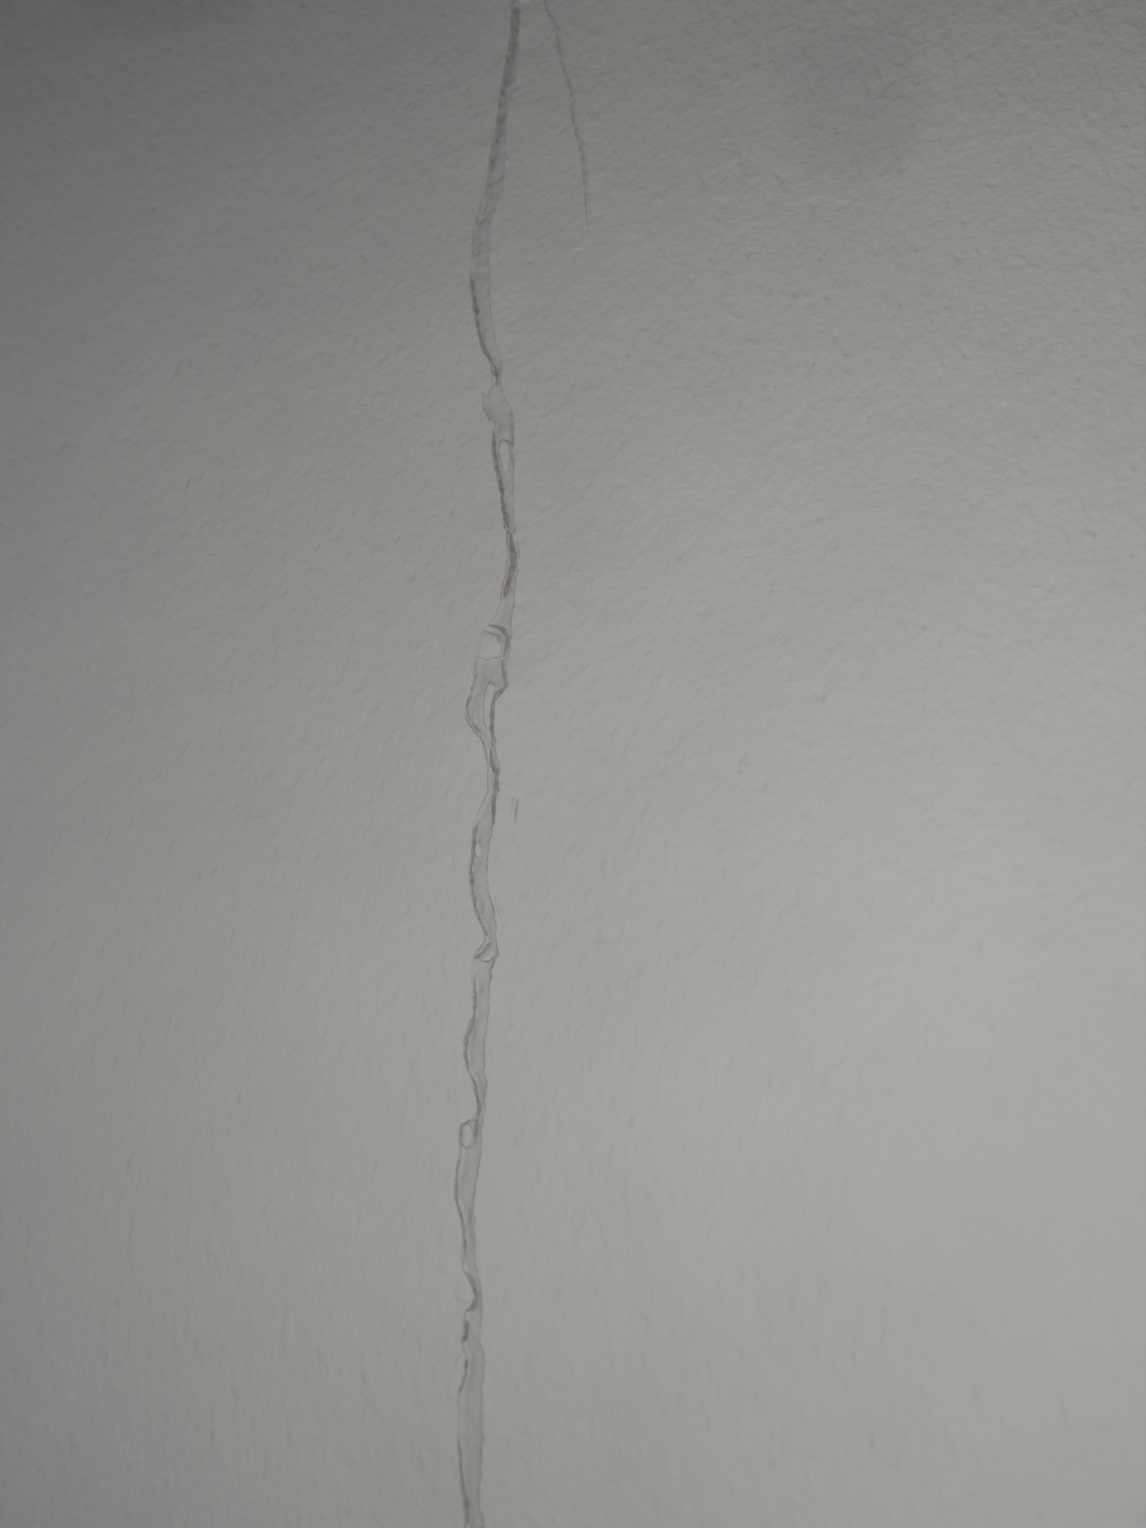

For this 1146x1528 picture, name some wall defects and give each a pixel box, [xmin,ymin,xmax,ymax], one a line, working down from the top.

crack [453,0,588,1528]